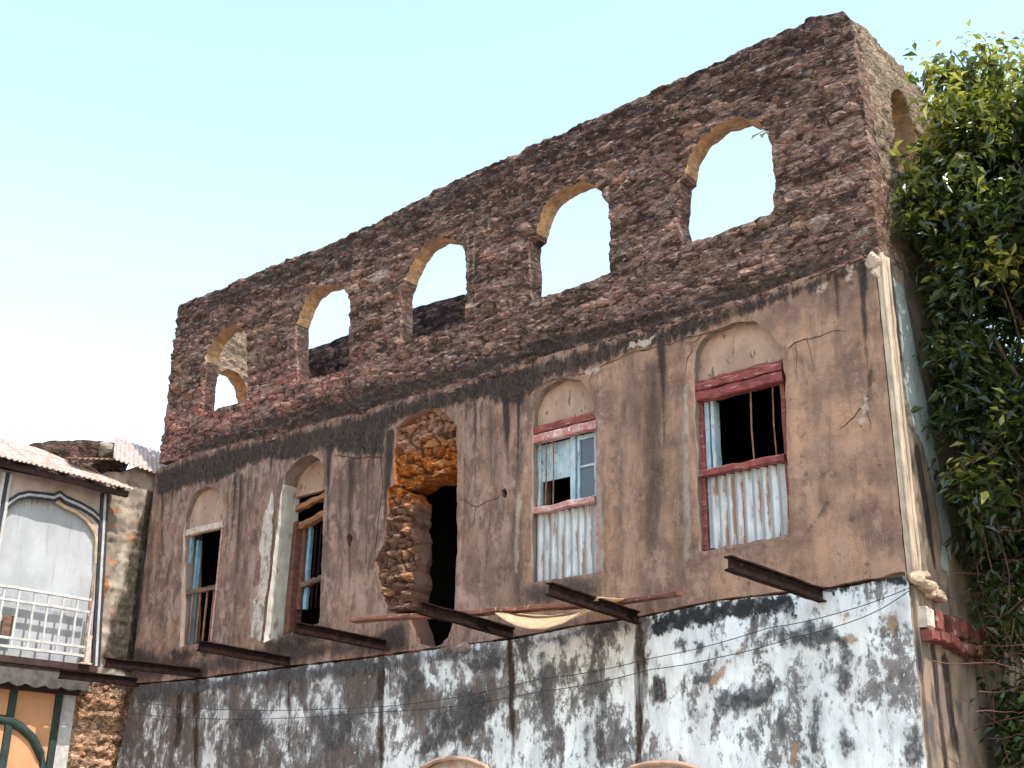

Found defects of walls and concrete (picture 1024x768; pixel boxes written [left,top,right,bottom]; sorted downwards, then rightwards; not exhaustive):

crack [789,330,839,375]
spalling [396,408,458,496]
damp [103,228,872,700]
damp [876,576,907,586]
damp [233,707,269,750]
damp [310,710,351,752]
damp [410,689,499,756]
damp [516,623,630,768]
damp [650,595,855,768]
damp [901,709,925,767]